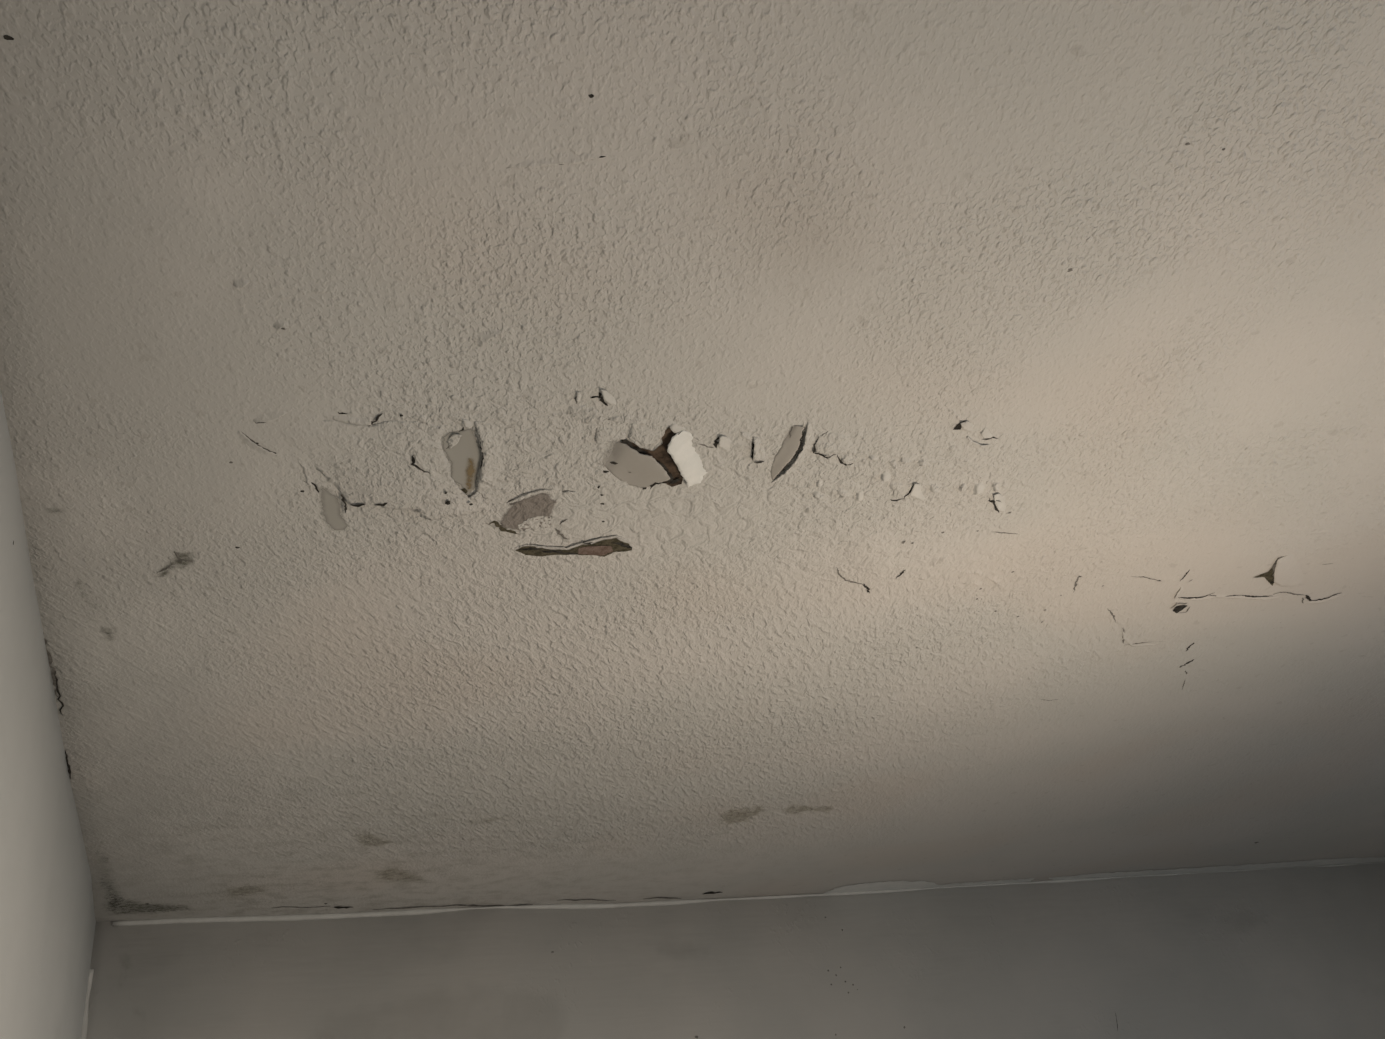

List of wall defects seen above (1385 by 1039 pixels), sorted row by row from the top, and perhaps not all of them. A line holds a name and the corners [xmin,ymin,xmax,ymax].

peeling [953,421,998,450]
peeling [280,412,816,557]
peeling [988,493,1011,513]
peeling [1254,555,1303,587]
crack [1041,571,1344,689]